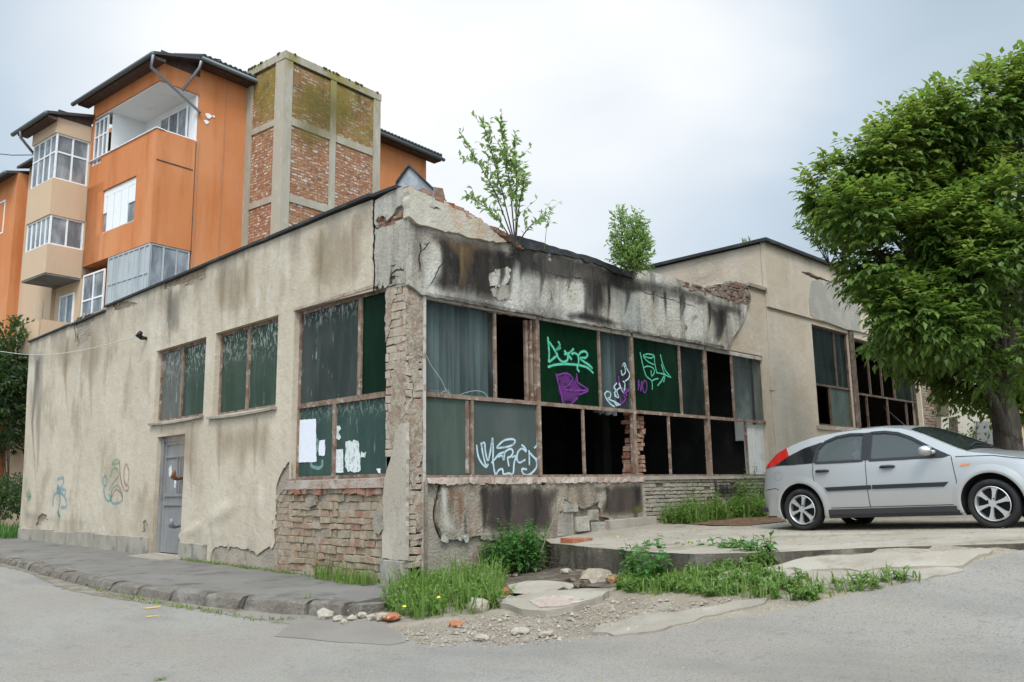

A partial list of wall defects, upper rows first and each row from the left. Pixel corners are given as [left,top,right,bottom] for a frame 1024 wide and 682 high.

spalling [377,197,412,228]
crack [372,200,443,292]
flaking render [489,266,511,301]
damp [437,239,733,347]
damp [32,359,40,432]
flaking render [375,279,423,457]
spalling [211,463,384,583]
spalling [402,462,545,576]
spalling [557,500,613,537]